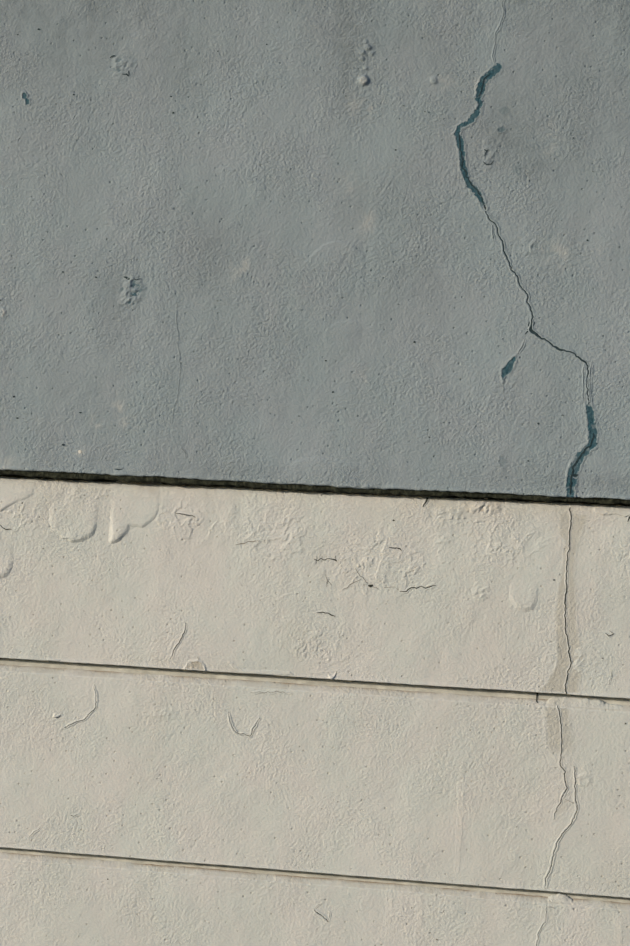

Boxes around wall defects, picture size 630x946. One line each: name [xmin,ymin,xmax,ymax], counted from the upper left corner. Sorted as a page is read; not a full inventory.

peeling [0,470,630,611]
crack [451,0,600,946]